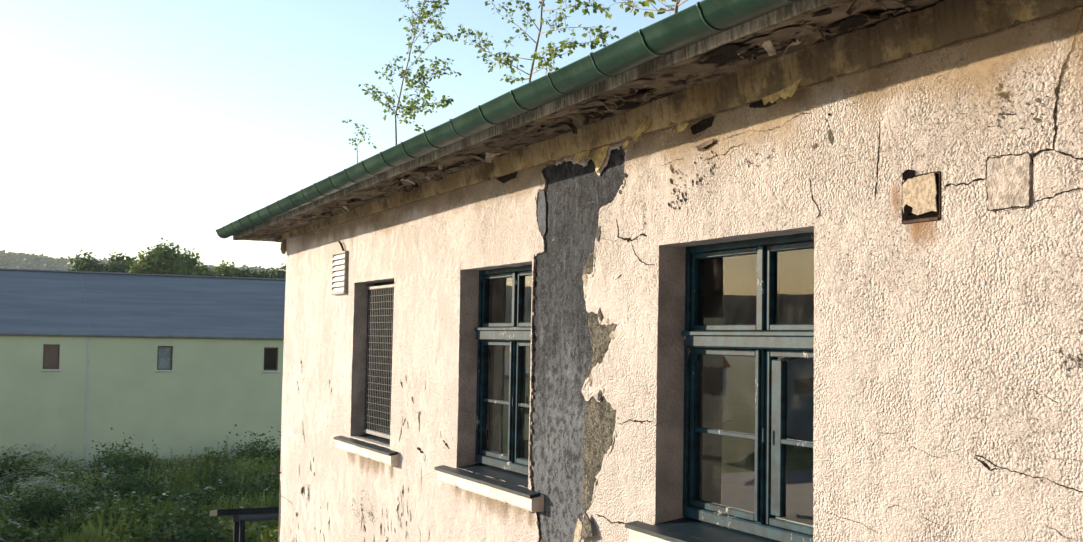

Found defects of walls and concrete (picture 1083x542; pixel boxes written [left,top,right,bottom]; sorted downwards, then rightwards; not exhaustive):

peeling [749,79,802,108]
crack [943,19,1083,211]
peeling [271,152,500,233]
spalling [496,172,518,183]
spalling [668,116,721,212]
crack [872,123,880,201]
crack [599,214,654,280]
peeling [529,119,651,542]
crack [617,419,662,429]
peeling [278,457,411,542]
crack [595,514,625,527]
crack [990,448,1083,495]